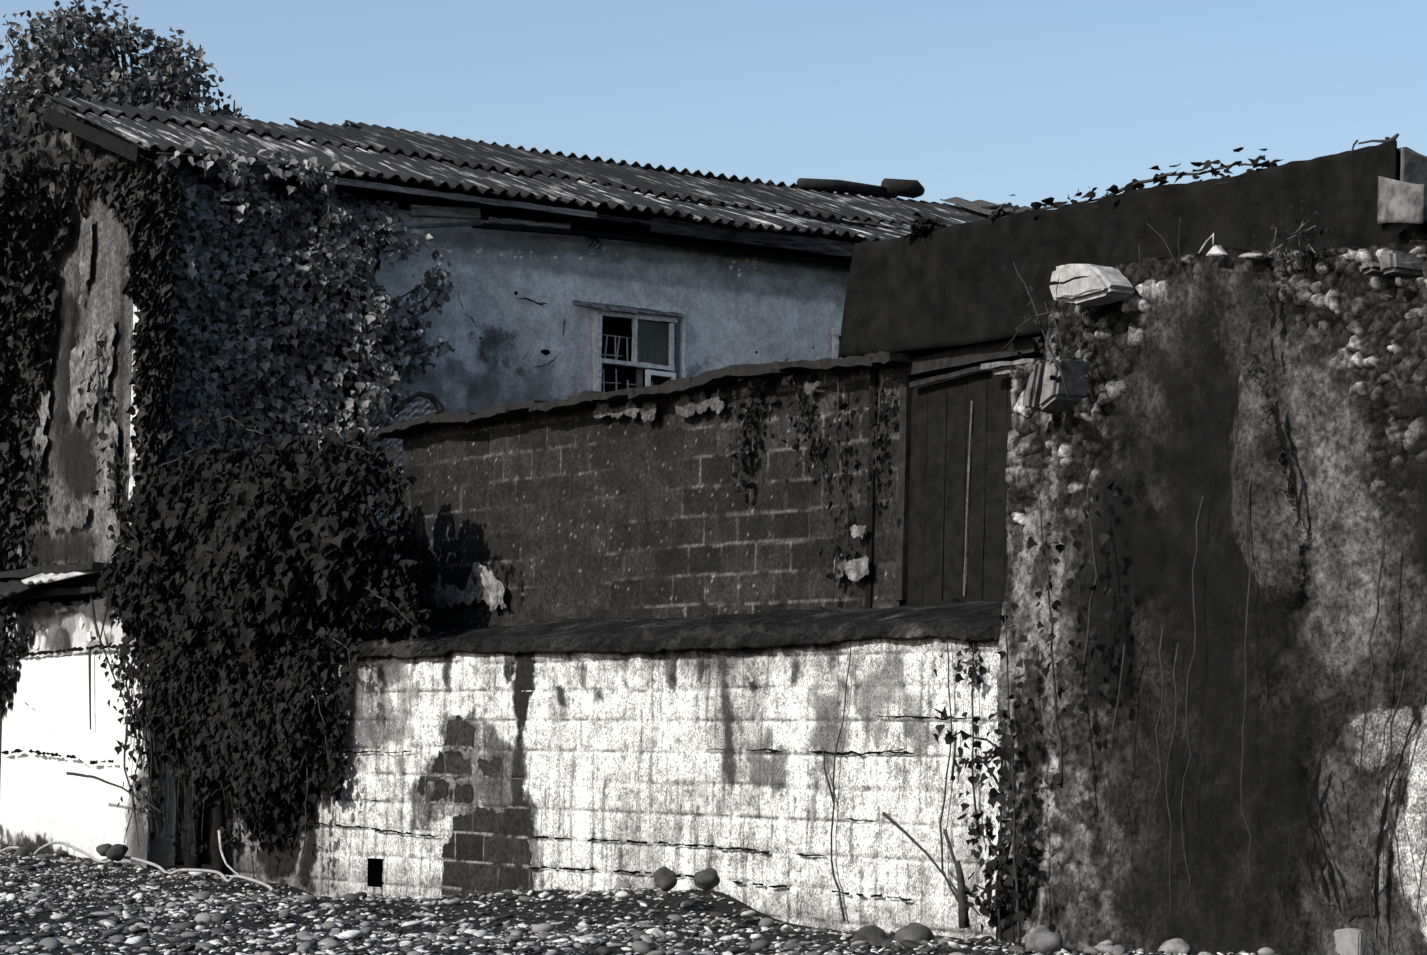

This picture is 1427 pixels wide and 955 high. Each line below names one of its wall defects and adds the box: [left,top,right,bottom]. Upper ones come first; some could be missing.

peeling [78,216,92,305]
peeling [6,308,56,563]
peeling [47,317,120,540]
water stain [404,313,593,413]
water stain [410,635,541,889]
water stain [555,685,564,706]
water stain [620,623,831,789]
crack [1307,758,1340,903]
crack [1373,715,1420,940]